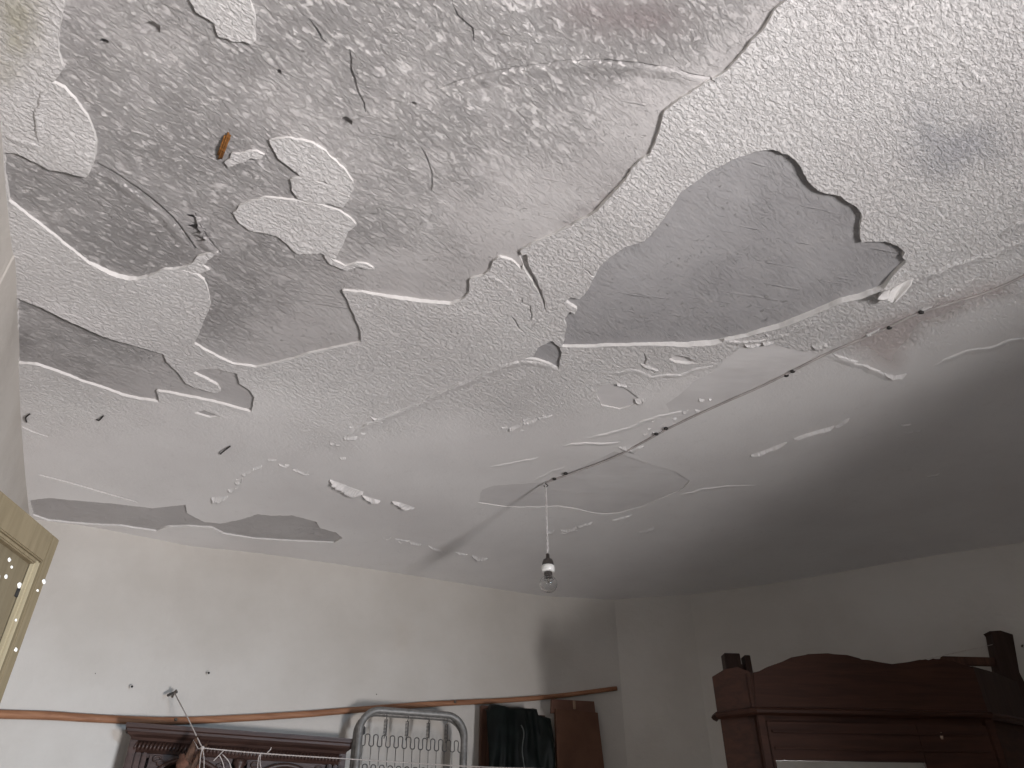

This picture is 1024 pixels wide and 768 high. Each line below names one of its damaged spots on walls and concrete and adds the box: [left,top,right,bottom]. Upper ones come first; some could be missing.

crack [308,18,366,112]
rust [217,132,231,160]
crack [421,147,433,190]
peeling [4,0,787,418]
peeling [478,150,913,535]
peeling [330,479,415,511]
peeling [29,498,342,543]